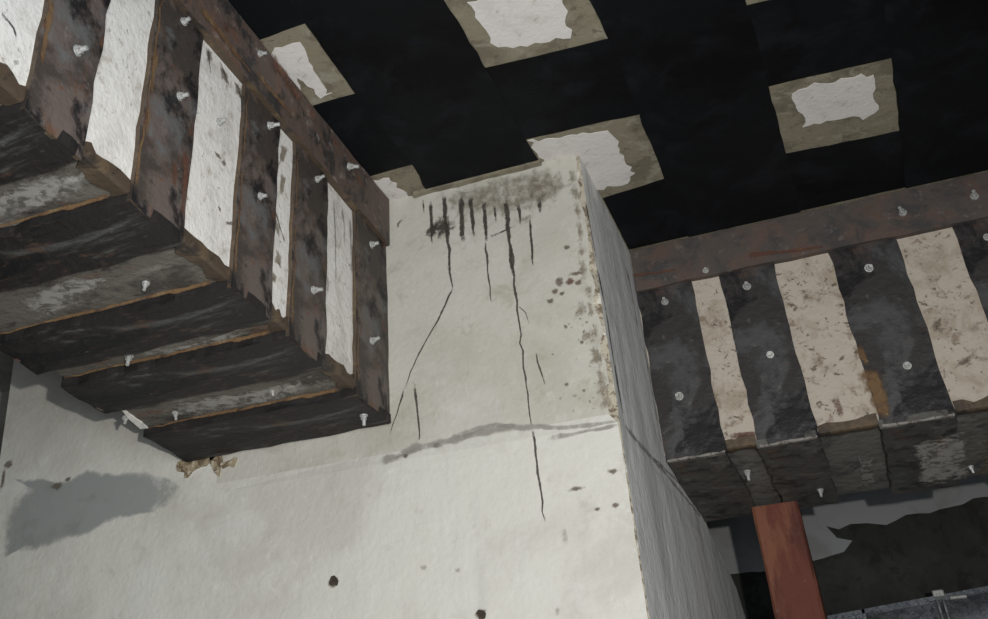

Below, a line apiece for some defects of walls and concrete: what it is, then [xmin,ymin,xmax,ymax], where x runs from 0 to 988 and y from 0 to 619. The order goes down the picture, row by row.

rust [274,57,301,100]
rust [173,153,189,210]
rust [0,195,106,228]
damp [423,178,556,273]
rust [0,281,209,334]
rust [67,330,268,378]
crack [384,243,700,519]
peeling [176,455,238,478]
damp [8,472,166,555]